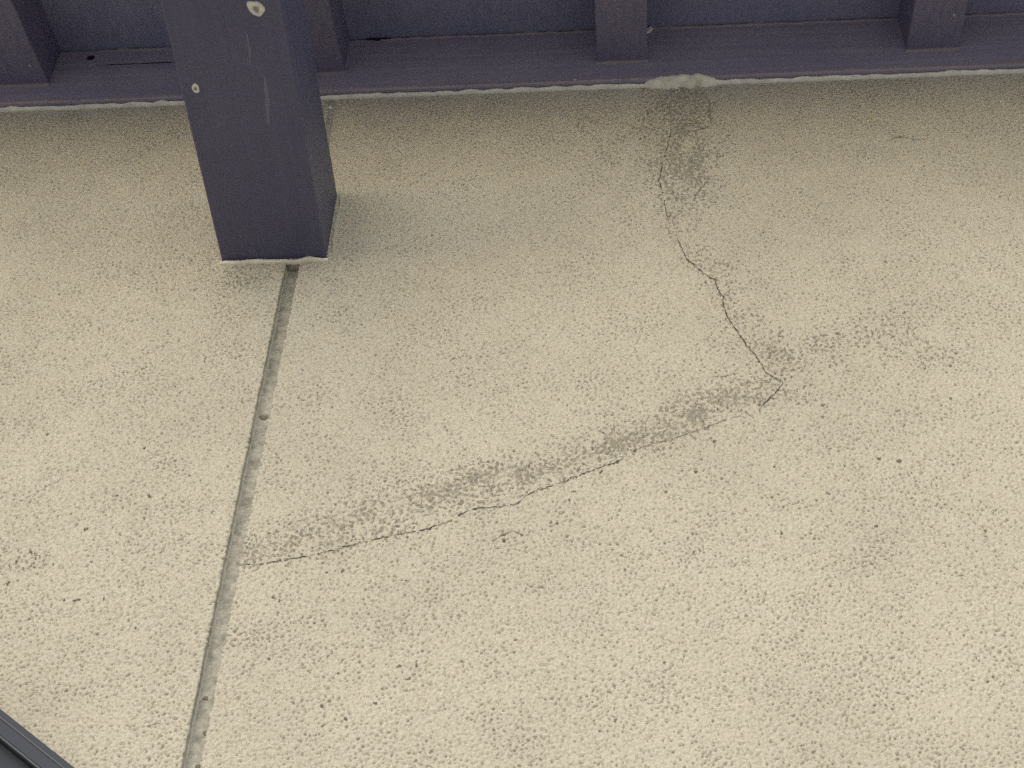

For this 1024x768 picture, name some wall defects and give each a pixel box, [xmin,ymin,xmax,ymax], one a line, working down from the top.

crack [244,99,784,565]
damp [241,87,956,575]